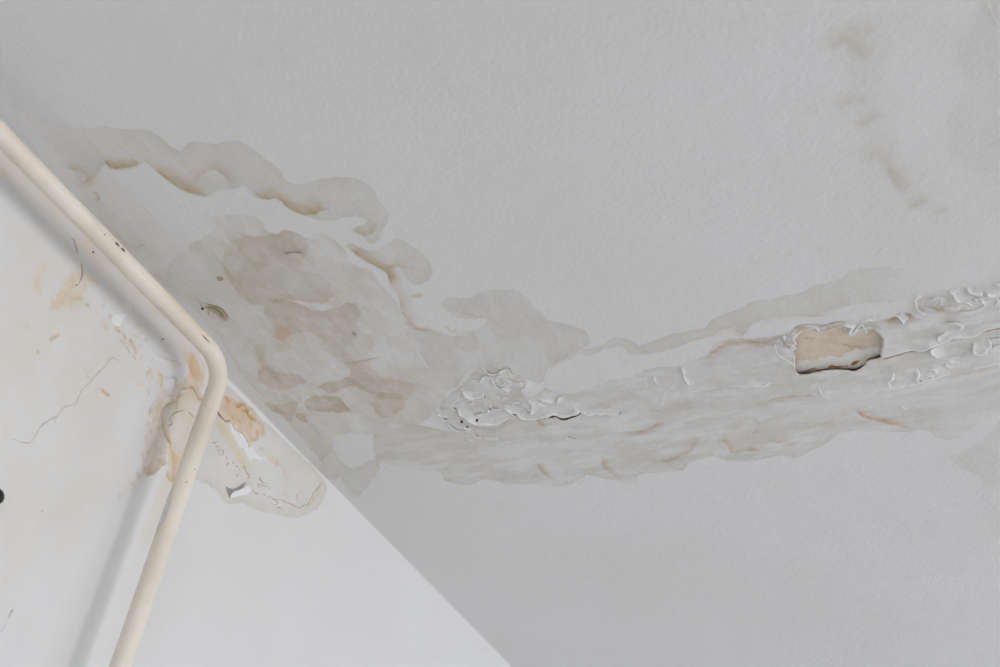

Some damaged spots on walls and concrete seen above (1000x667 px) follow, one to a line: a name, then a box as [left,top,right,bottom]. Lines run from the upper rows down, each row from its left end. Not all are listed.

damp [48,120,1000,518]
flaking render [766,282,1000,393]
crack [10,357,118,444]
peeling [437,365,621,448]
flaking render [226,482,251,498]